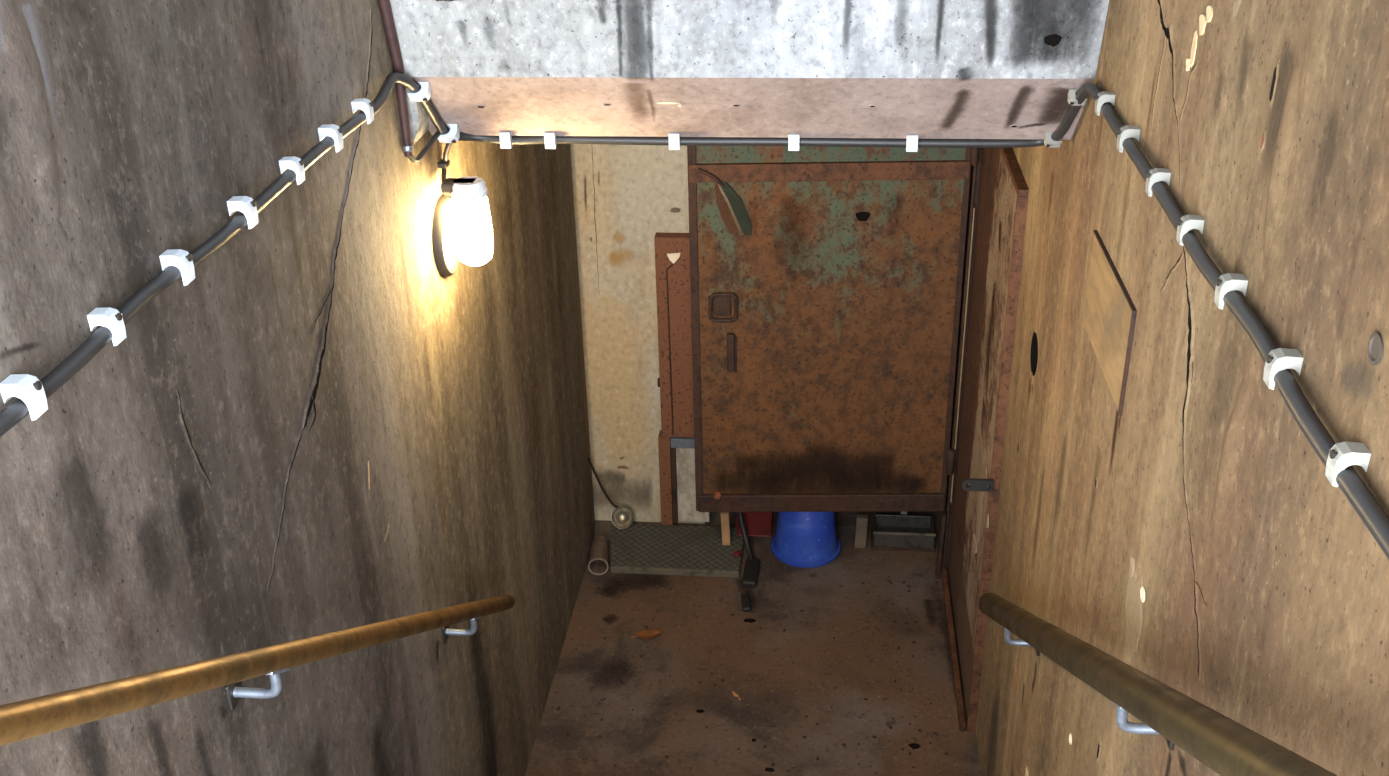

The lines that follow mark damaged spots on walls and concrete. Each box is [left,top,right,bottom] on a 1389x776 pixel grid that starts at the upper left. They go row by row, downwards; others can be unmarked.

crack [419,0,465,8]
damp [600,0,652,79]
damp [936,0,944,49]
damp [986,0,996,61]
damp [1013,0,1093,62]
crack [1151,0,1199,190]
crack [591,144,600,296]
crack [267,9,372,594]
crack [1161,245,1208,681]